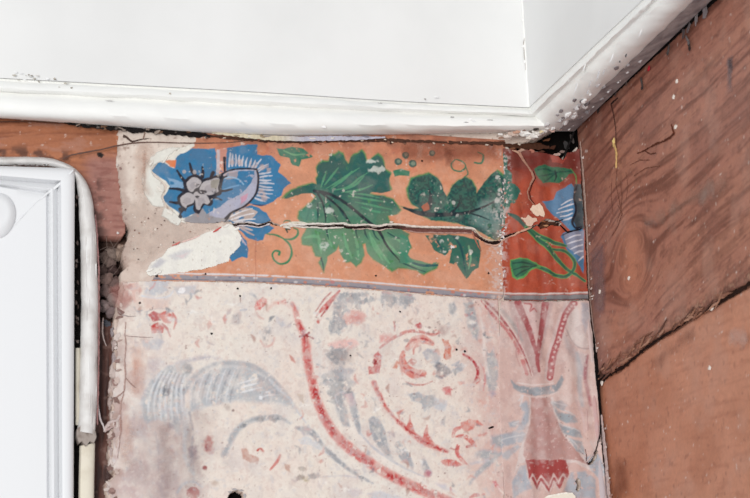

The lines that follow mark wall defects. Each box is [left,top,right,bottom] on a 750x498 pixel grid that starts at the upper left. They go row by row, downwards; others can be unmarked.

peeling [485,54,642,156]
peeling [142,147,186,225]
peeling [146,224,242,277]
crack [232,219,582,251]
spalling [74,215,125,475]